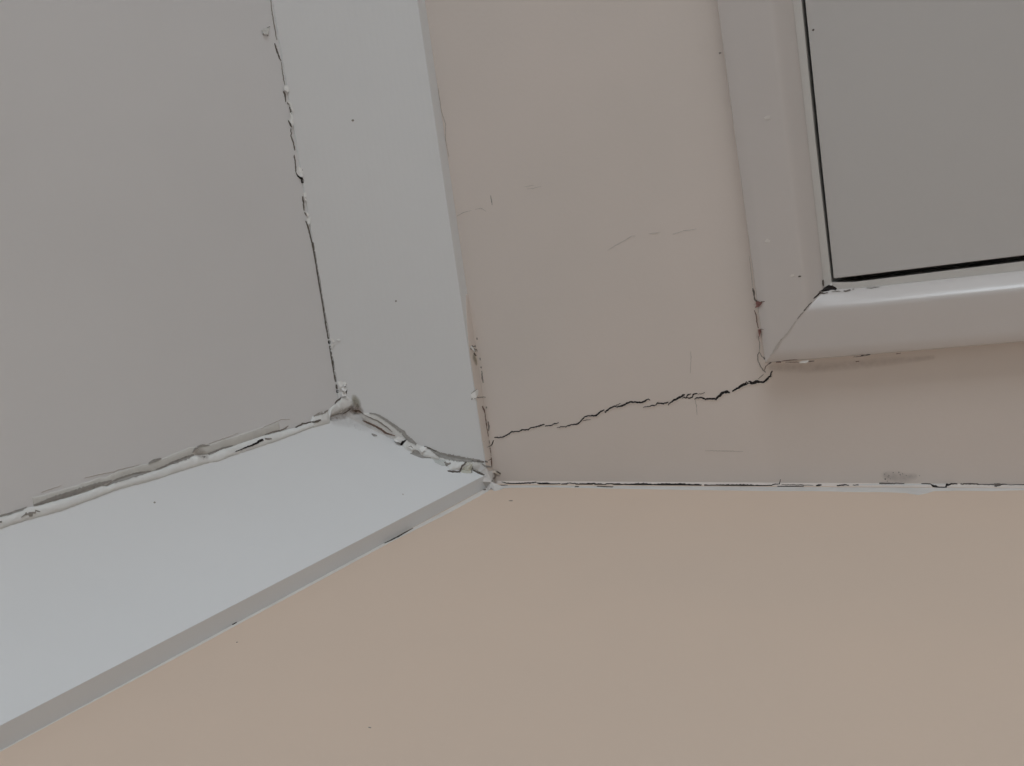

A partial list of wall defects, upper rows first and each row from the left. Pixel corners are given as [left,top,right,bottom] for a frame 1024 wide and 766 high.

crack [0,0,347,523]
crack [362,257,1024,490]